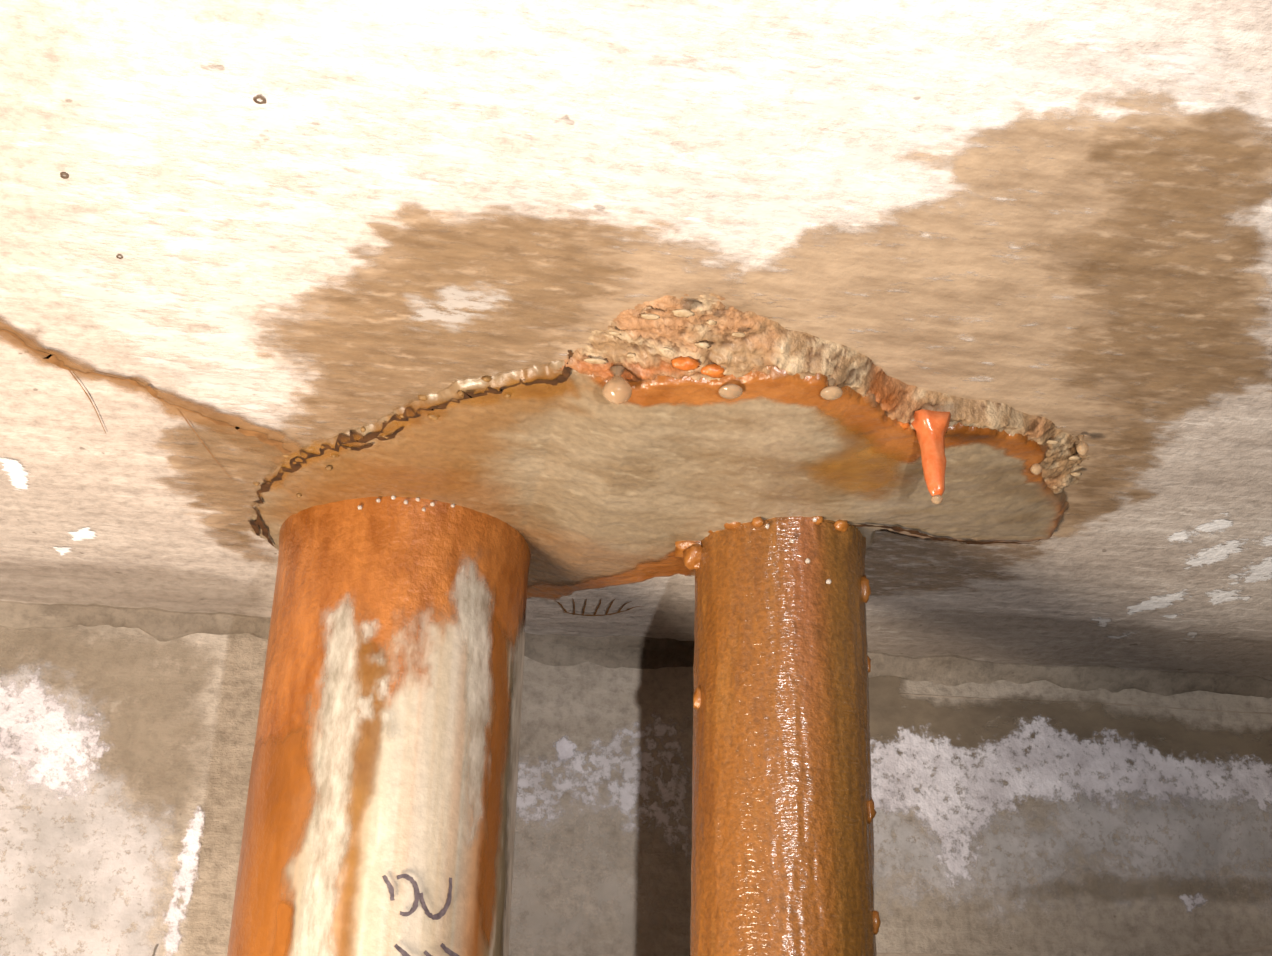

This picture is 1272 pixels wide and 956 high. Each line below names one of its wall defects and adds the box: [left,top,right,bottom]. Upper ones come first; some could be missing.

efflorescence [0,458,28,491]
crack [0,319,575,546]
damp [41,2,1272,595]
rust [627,369,921,463]
spalling [557,292,1090,494]
rust [812,516,849,532]
rust [945,422,1045,482]
efflorescence [0,668,204,956]
damp [868,675,1272,912]